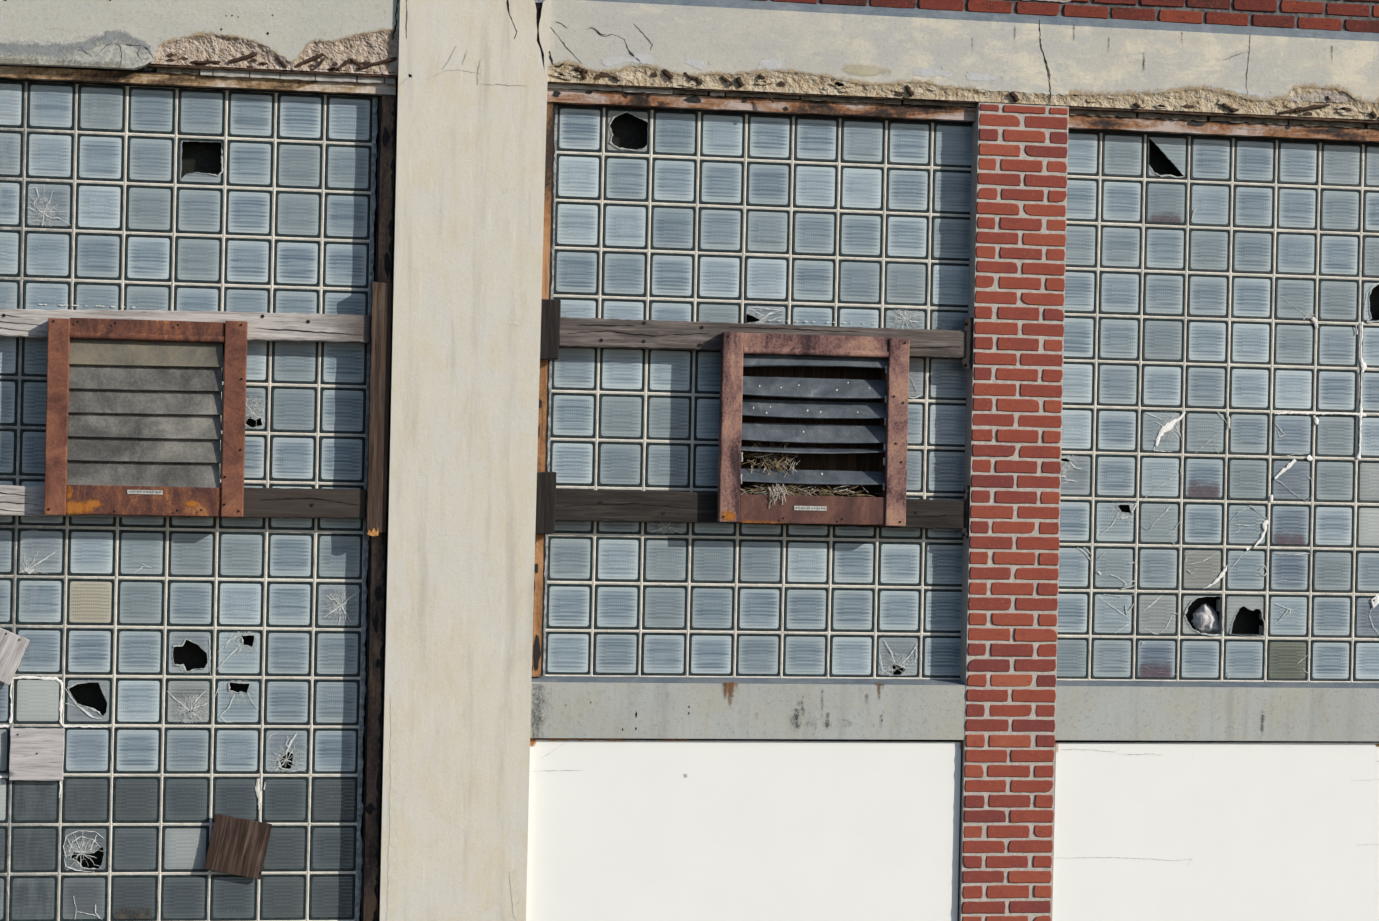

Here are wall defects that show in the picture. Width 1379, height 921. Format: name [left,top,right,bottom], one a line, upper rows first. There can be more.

spalling [151,14,412,78]
crack [392,0,408,40]
crack [400,0,653,86]
spalling [548,53,1379,120]